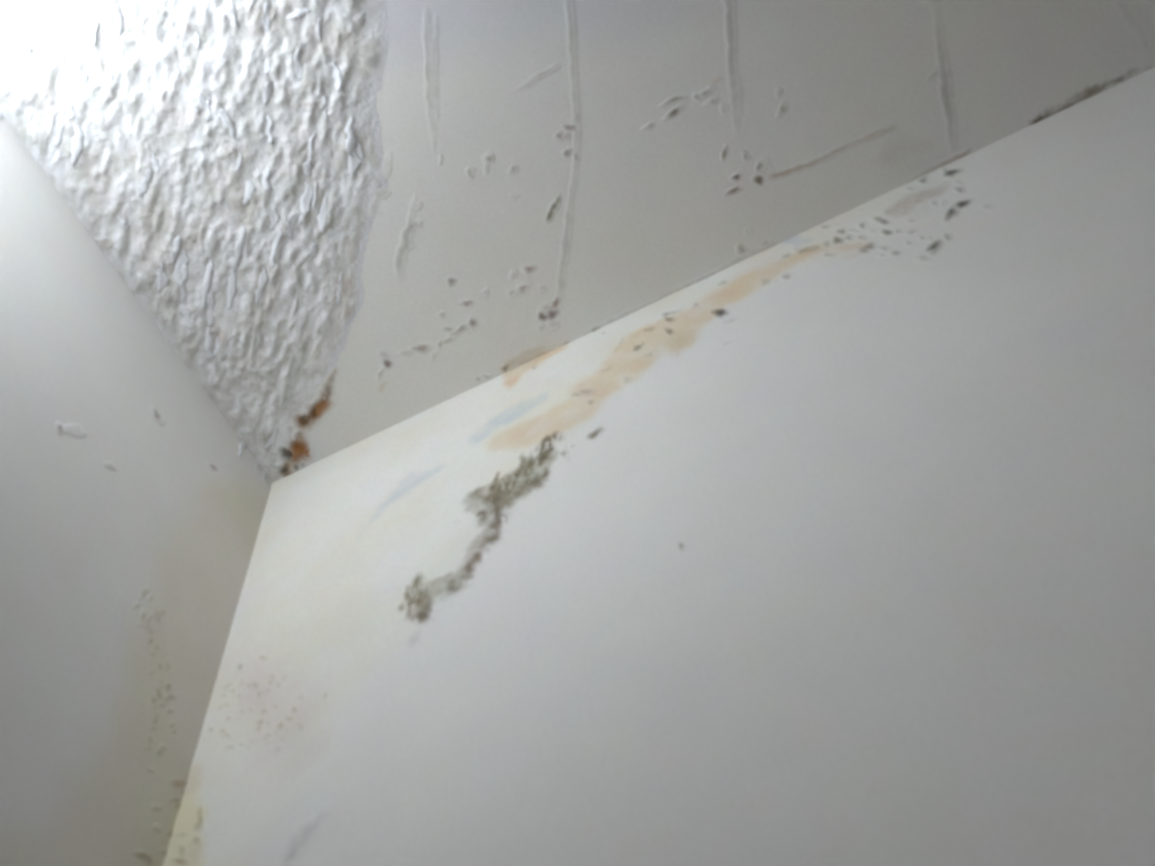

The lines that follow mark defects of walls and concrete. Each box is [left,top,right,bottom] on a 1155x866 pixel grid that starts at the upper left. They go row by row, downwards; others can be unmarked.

crack [721,0,745,134]
water stain [270,0,1155,476]
corrosion [282,366,341,478]
water stain [351,386,552,546]
water stain [391,426,610,652]